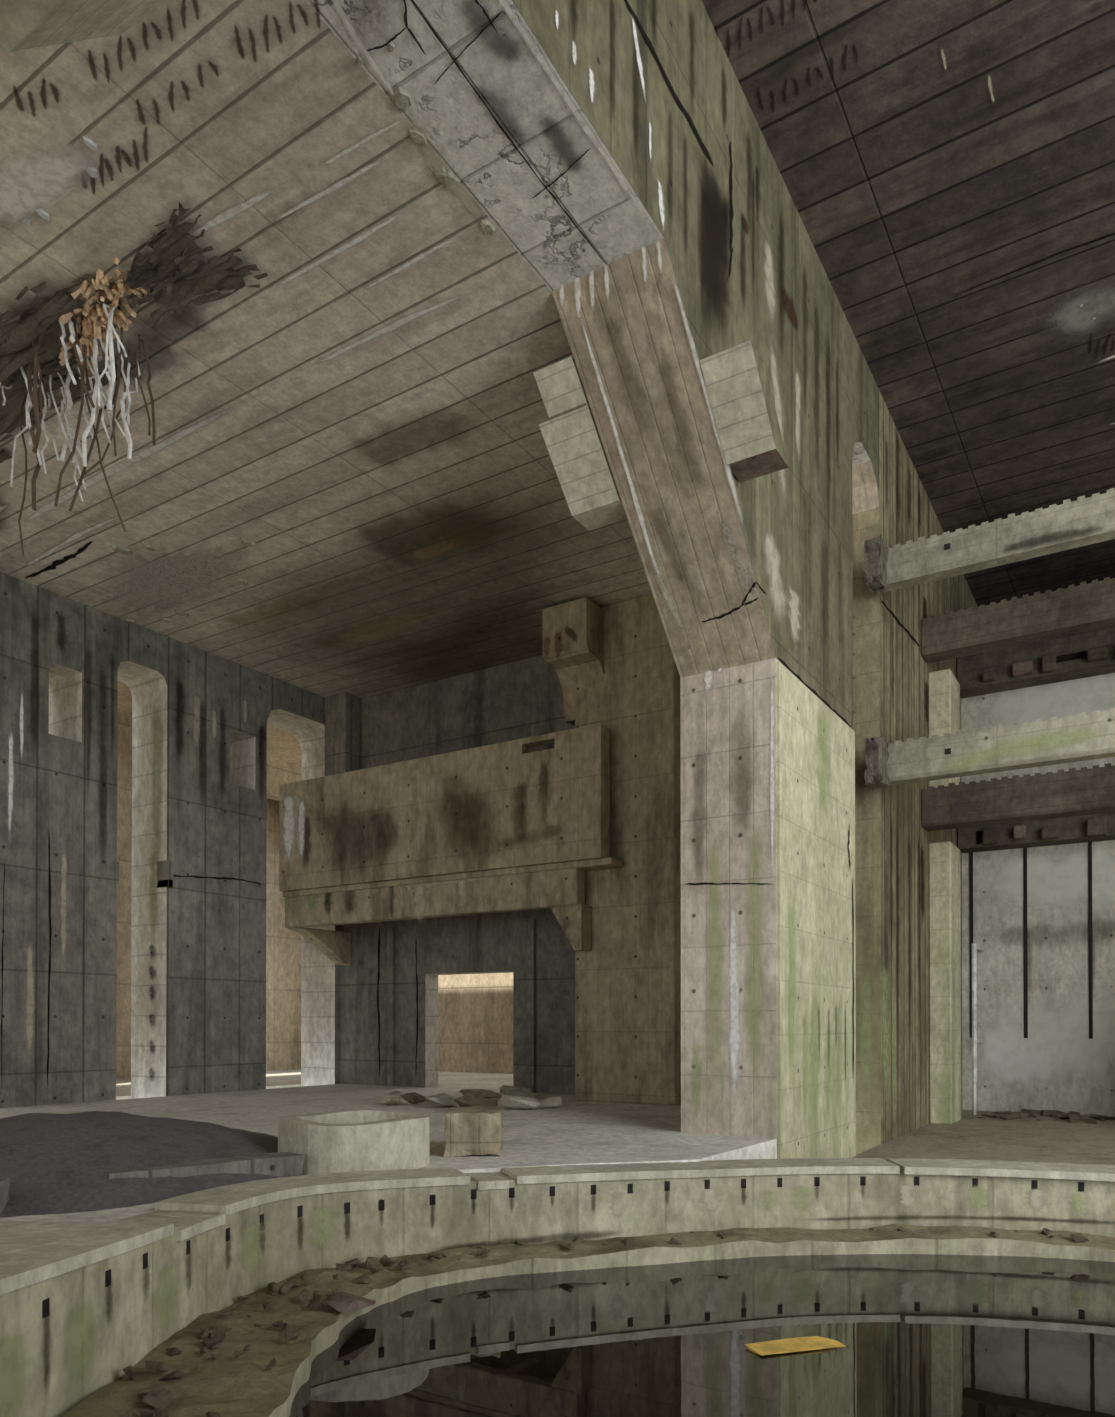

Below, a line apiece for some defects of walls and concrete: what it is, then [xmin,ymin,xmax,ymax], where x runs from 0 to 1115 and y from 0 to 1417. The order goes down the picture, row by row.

peeling [0,136,100,225]
crack [367,0,609,267]
water stain [632,19,652,158]
water stain [642,242,662,283]
water stain [658,150,686,224]
crack [625,0,734,277]
water stain [685,178,745,309]
water stain [560,264,658,572]
water stain [674,282,740,513]